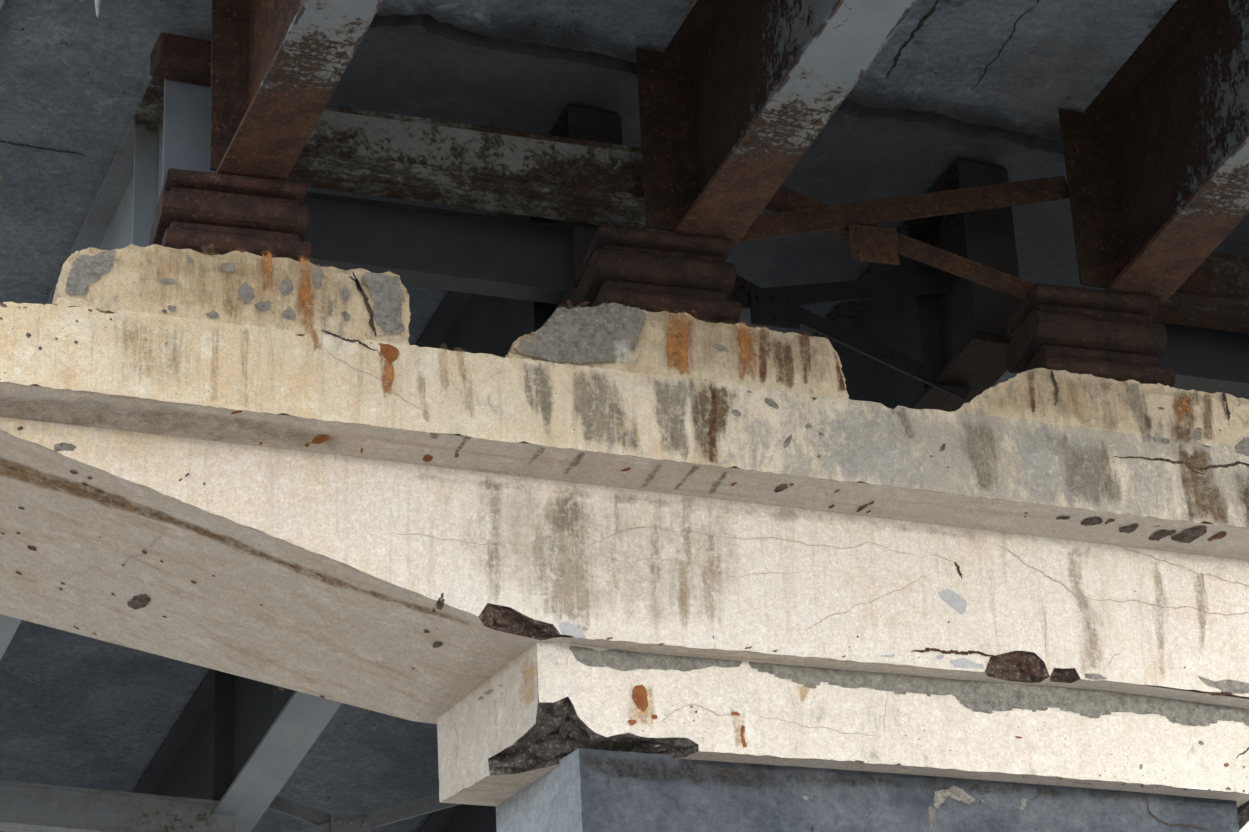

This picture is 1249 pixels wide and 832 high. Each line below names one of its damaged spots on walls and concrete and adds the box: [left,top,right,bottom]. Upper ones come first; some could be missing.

crack [887,0,939,79]
crack [320,272,431,417]
rust [379,343,399,397]
leakage [525,364,551,424]
leakage [575,374,637,448]
leakage [656,382,736,493]
crack [1113,456,1249,474]
spalling [488,696,699,775]
rust [628,685,658,726]
rust [731,712,747,748]
peeling [478,603,1249,745]
spalling [1226,787,1249,830]